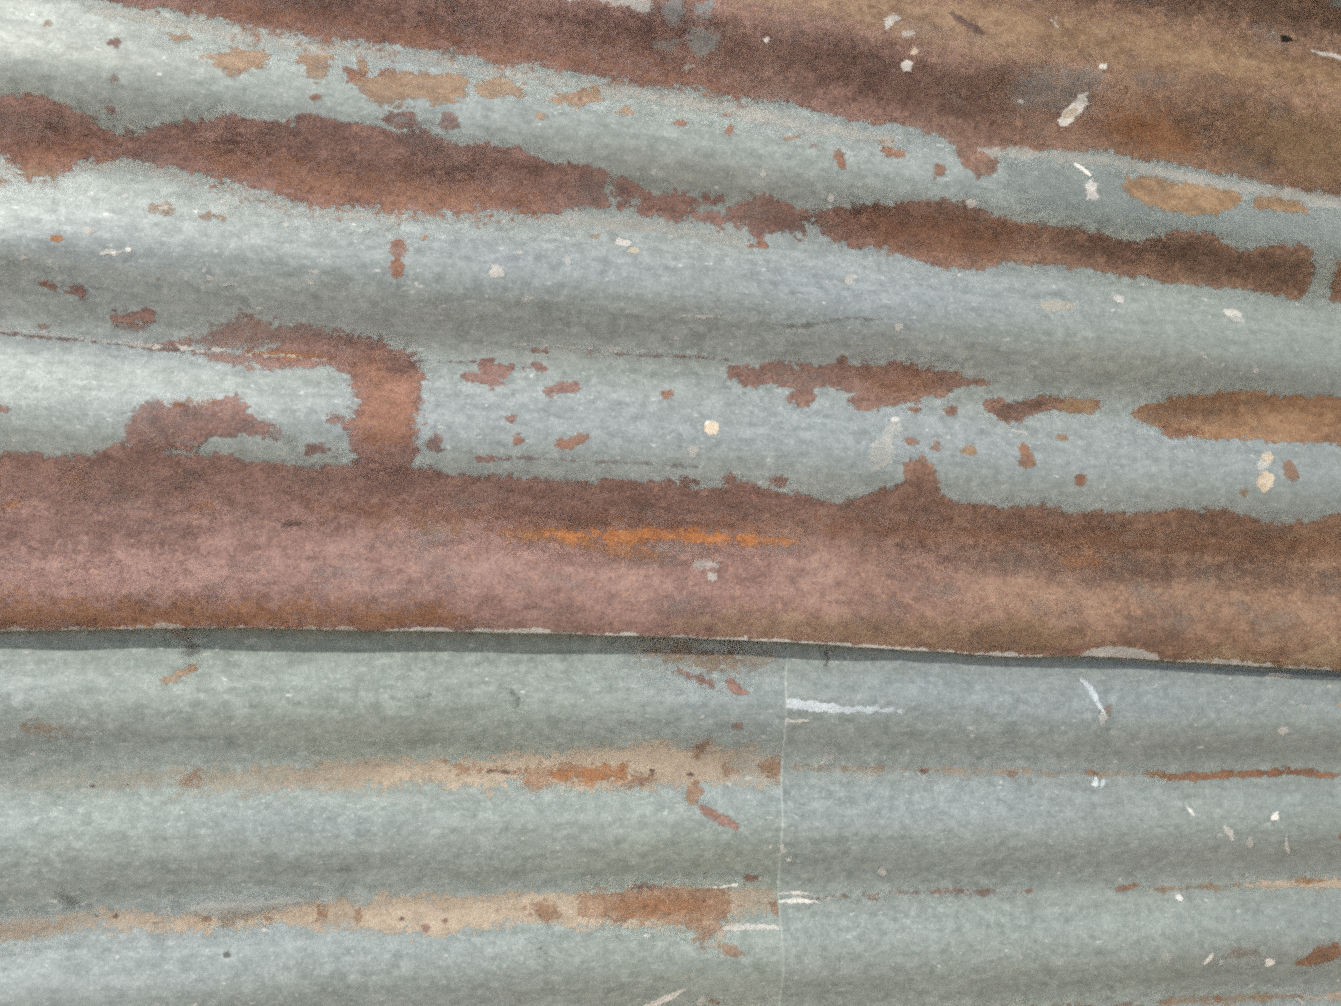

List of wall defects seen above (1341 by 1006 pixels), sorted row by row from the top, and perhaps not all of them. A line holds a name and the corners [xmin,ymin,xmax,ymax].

rust [0,0,1341,303]
peeling [1004,162,1341,276]
rust [0,307,1341,670]
peeling [704,421,719,435]
peeling [1256,451,1275,493]